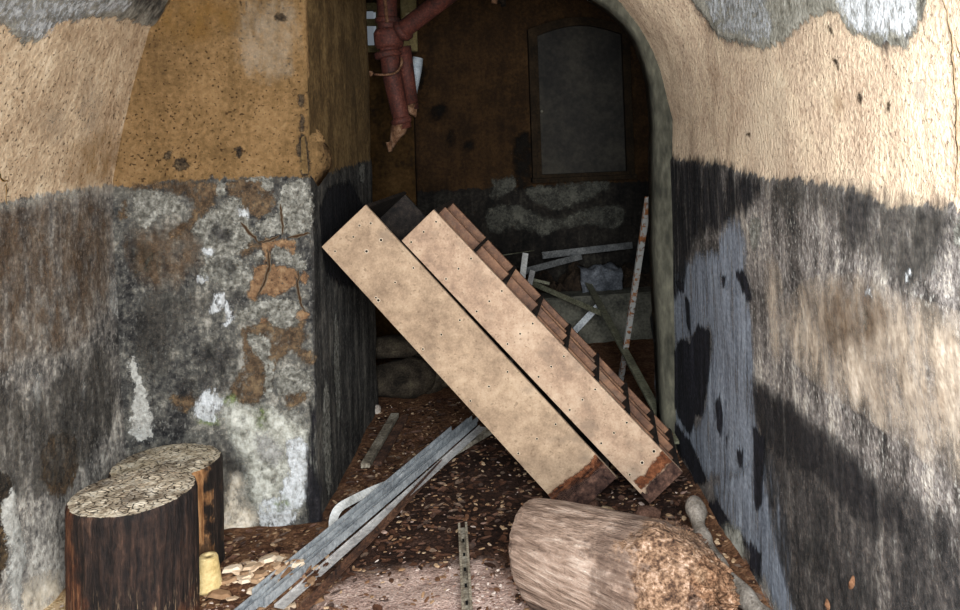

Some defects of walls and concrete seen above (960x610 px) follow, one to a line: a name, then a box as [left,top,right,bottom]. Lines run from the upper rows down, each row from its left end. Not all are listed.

peeling [0,0,132,38]
peeling [707,0,771,41]
peeling [836,0,917,37]
damp [0,204,118,346]
peeling [117,94,315,430]
damp [212,223,230,242]
damp [0,347,114,501]
efflorescence [127,356,155,441]
damp [222,313,341,529]
damp [641,156,960,610]
damp [0,577,62,610]